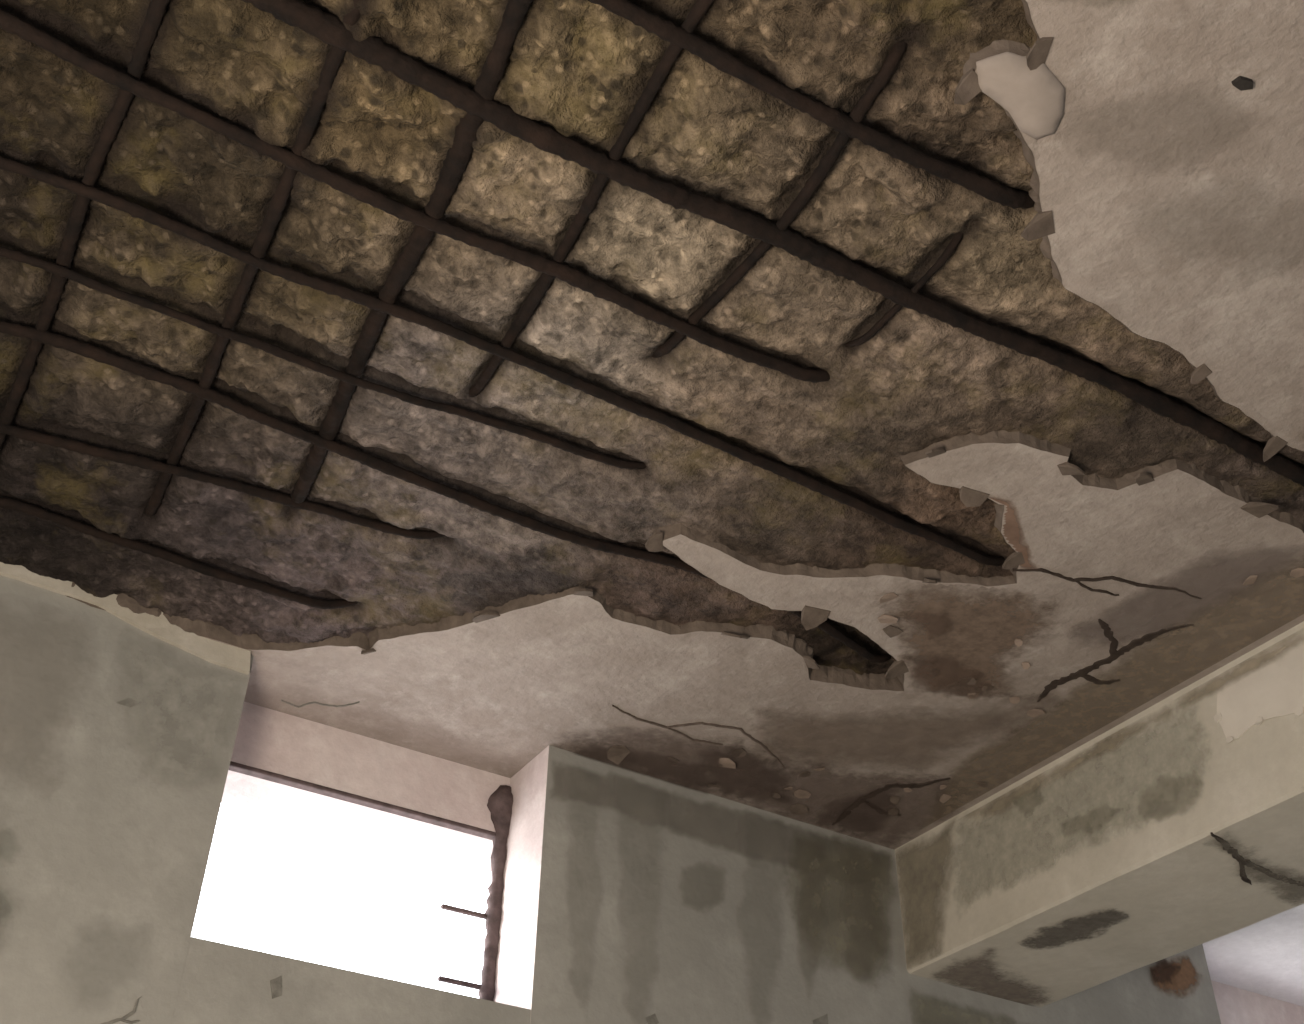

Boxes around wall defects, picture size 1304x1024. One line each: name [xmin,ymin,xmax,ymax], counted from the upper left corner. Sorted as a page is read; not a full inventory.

spalling [0,0,1304,704]
crack [1012,568,1201,702]
crack [612,705,785,768]
leakage [573,564,1304,974]
crack [1211,832,1272,885]